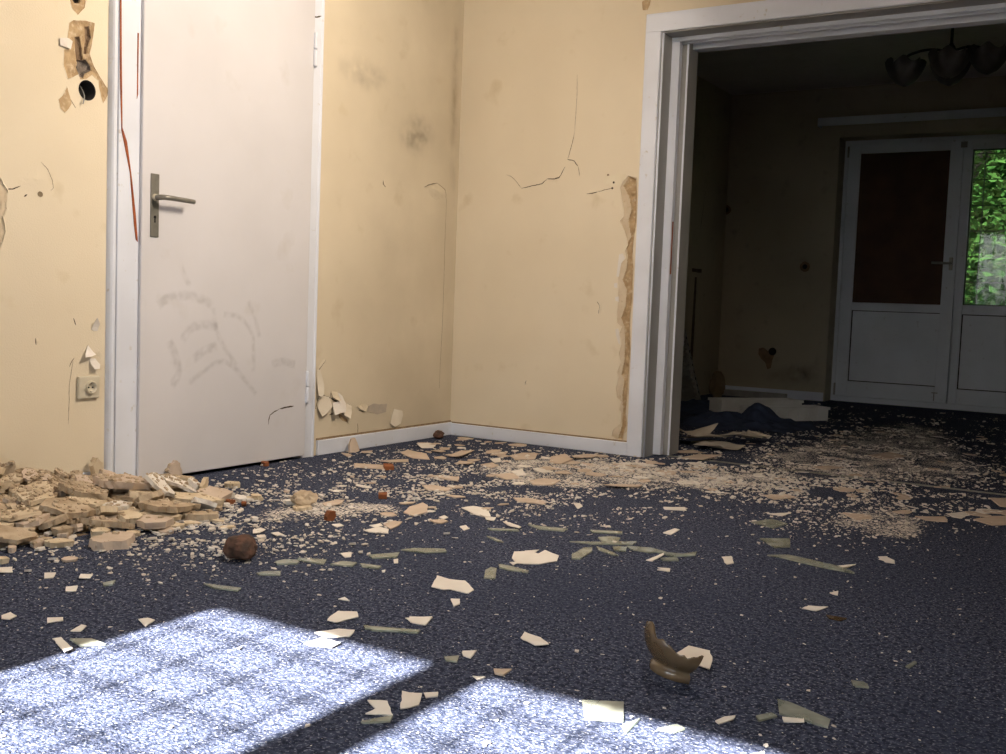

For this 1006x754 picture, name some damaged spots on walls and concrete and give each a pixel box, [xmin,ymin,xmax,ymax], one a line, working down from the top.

spalling [58,0,108,113]
crack [508,101,611,194]
spalling [0,176,9,252]
spalling [611,175,637,440]
peeling [316,369,403,427]